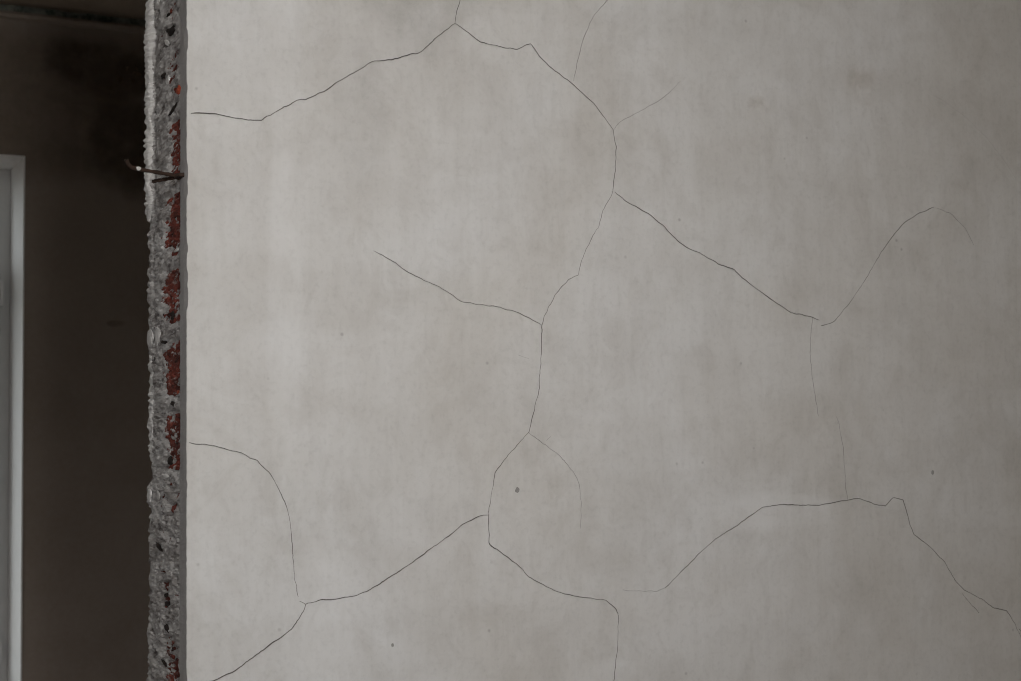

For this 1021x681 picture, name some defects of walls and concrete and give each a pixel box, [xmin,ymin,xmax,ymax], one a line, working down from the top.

crack [190,2,974,681]